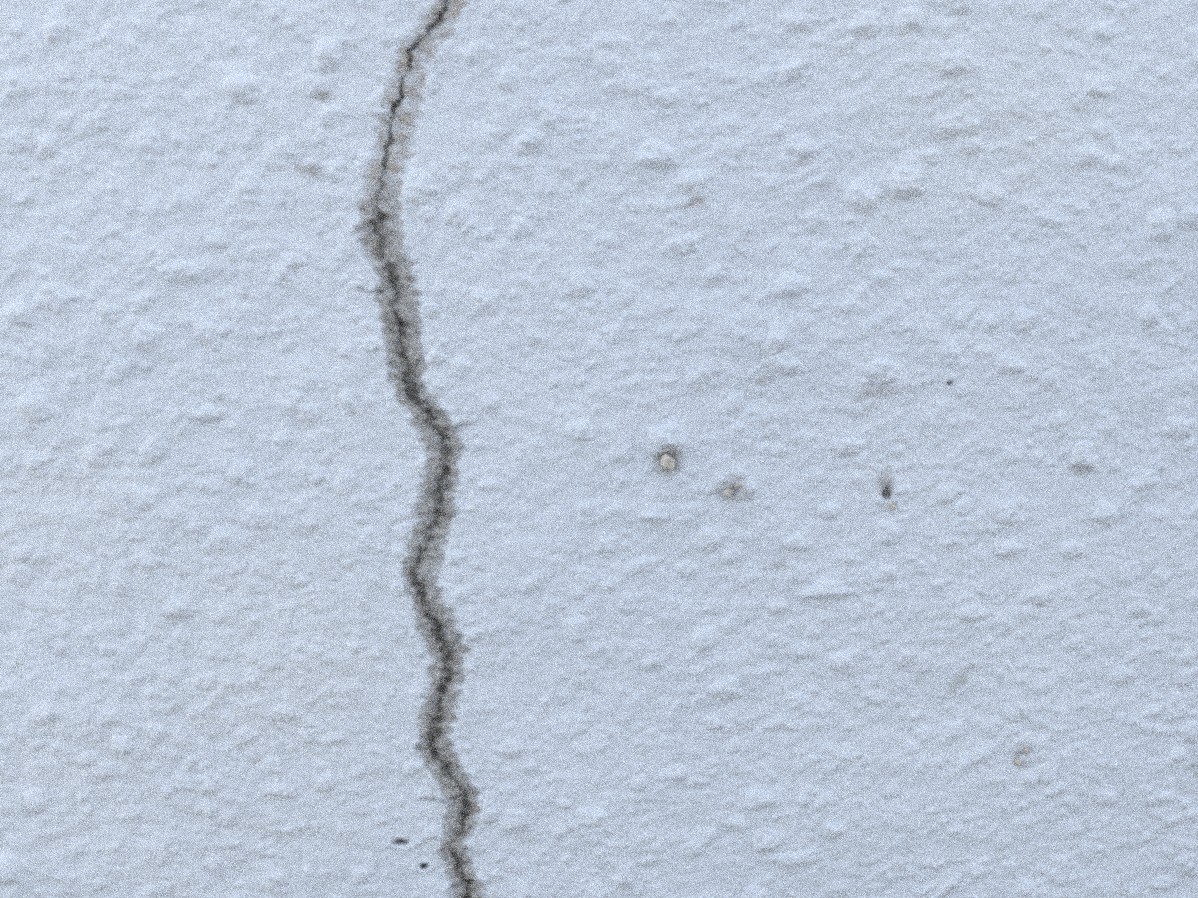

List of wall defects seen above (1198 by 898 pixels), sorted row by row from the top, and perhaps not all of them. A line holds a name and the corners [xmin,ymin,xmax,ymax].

crack [357,0,500,898]